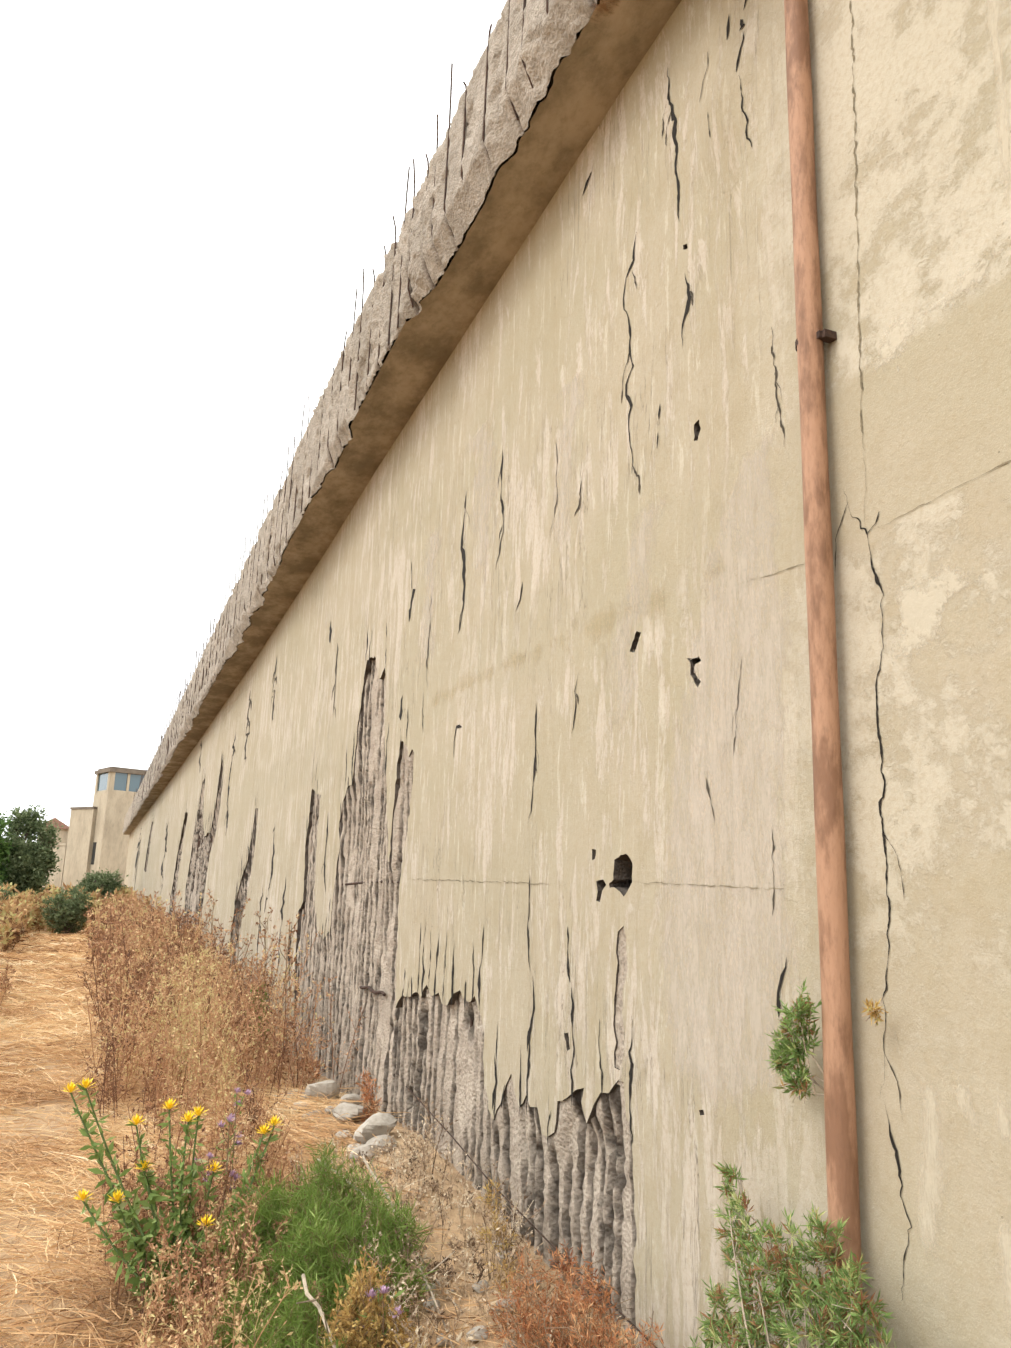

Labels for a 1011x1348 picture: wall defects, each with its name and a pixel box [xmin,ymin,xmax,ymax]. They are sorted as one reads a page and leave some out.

crack [662,0,752,219]
crack [621,232,660,492]
crack [681,277,693,345]
crack [835,1,1011,1300]
spalling [295,623,637,1336]